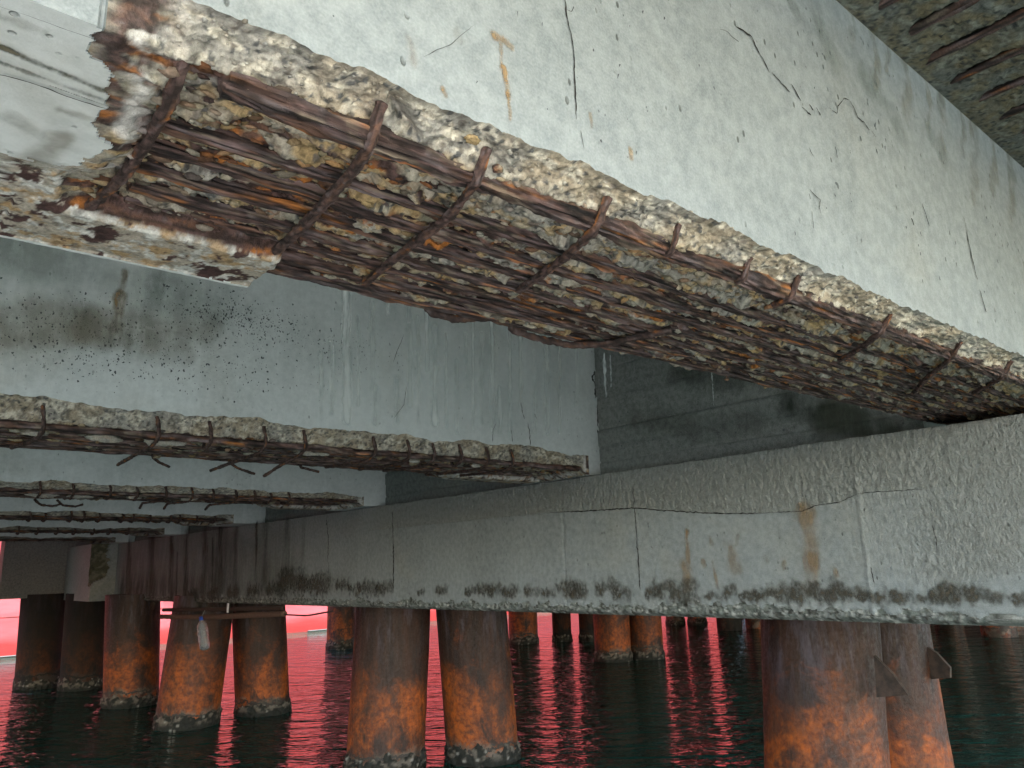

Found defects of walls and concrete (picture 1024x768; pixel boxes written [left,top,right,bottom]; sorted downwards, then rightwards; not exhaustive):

rust [501,64,510,107]
crack [565,1,584,146]
crack [721,27,876,137]
spalling [0,0,1024,424]
spalling [0,393,589,484]
spalling [0,480,364,587]
crack [549,489,937,587]